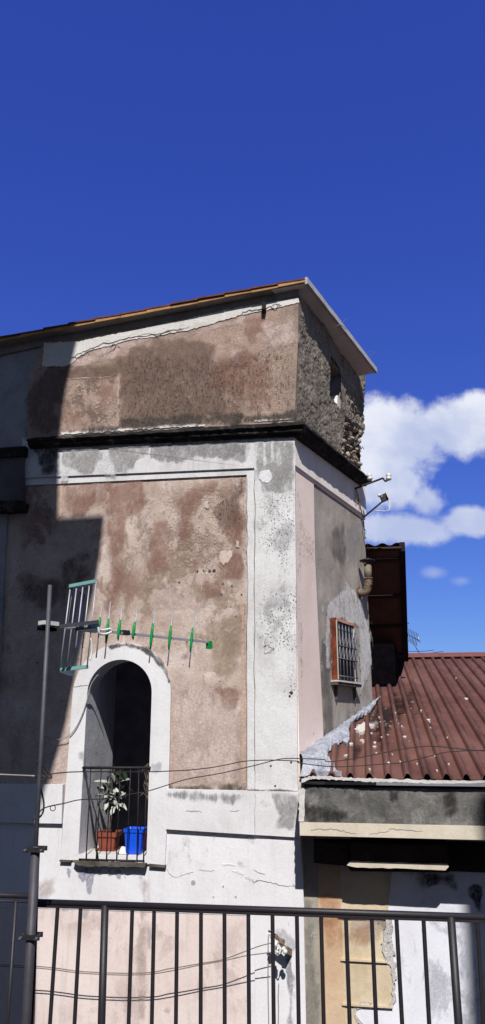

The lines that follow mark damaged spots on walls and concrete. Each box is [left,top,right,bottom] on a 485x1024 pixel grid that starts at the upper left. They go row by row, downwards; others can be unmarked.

water stain [28,316,296,433]
spalling [341,422,363,472]
water stain [168,750,317,828]
spalling [354,920,397,1024]